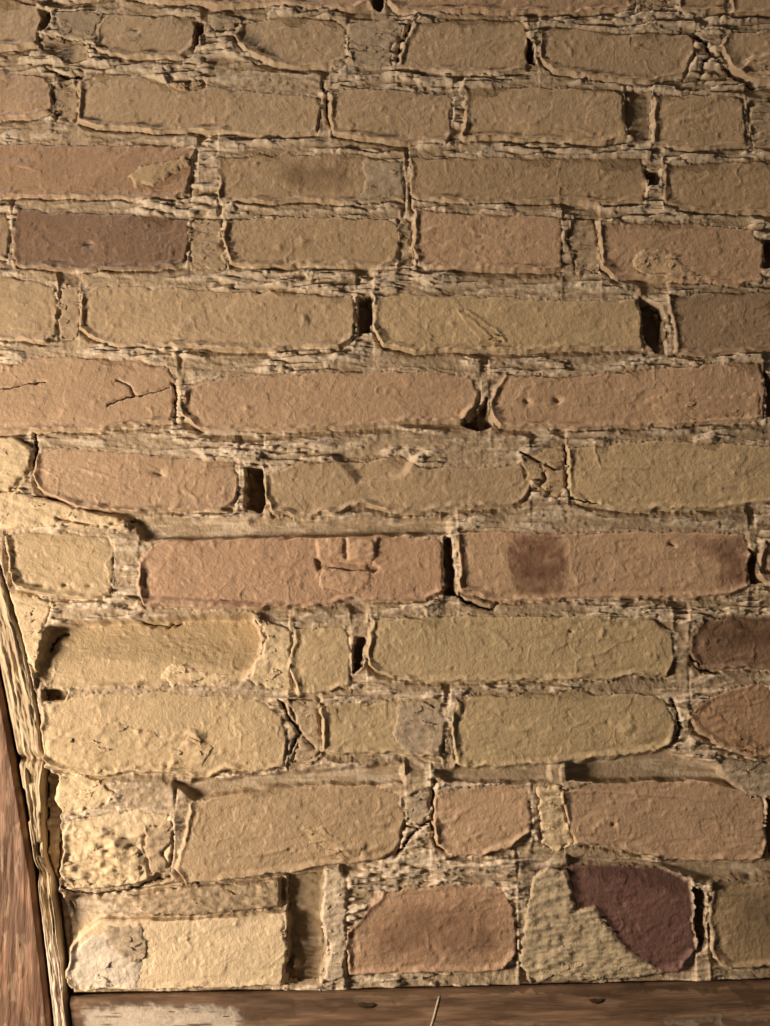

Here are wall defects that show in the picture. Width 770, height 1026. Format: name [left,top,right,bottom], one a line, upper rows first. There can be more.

crack [693,37,751,91]
crack [110,381,178,421]
crack [280,701,301,752]